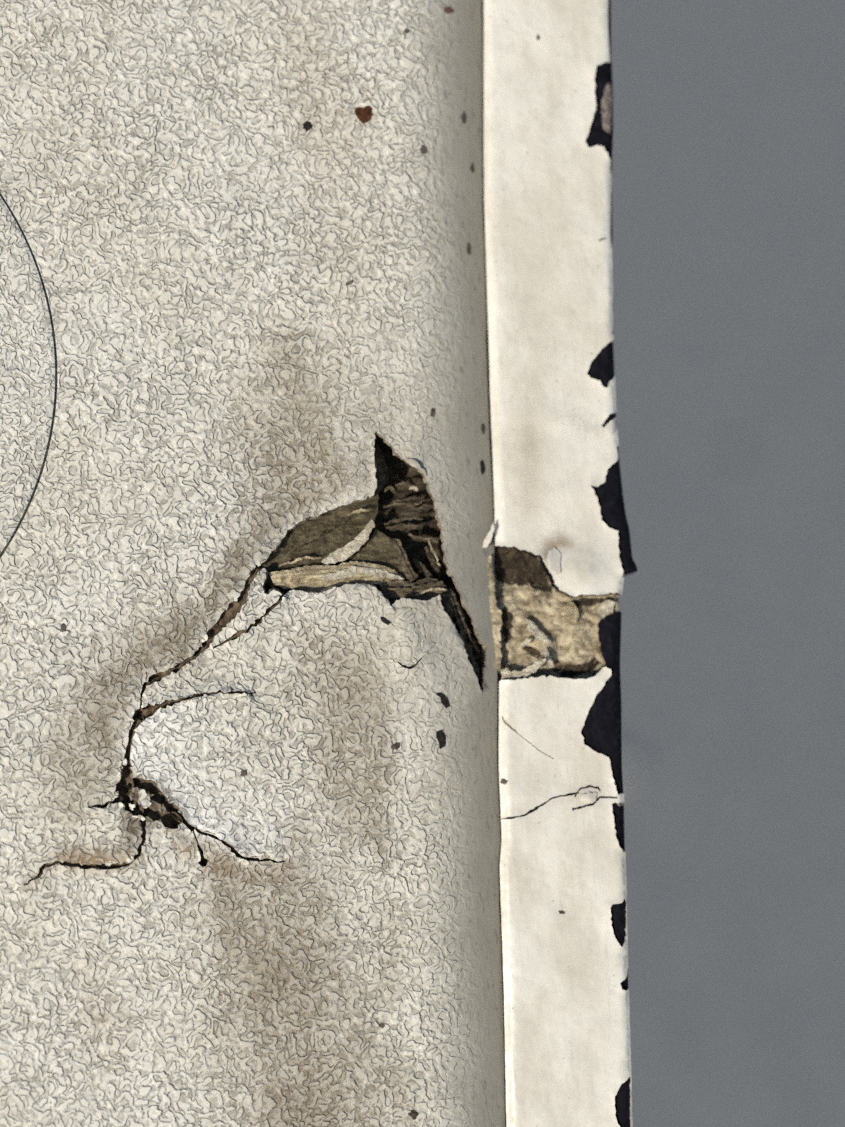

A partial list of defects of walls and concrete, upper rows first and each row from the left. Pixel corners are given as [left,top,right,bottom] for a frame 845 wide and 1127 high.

peeling [601,413,616,433]
peeling [591,446,637,578]
spalling [264,584,308,594]
spalling [331,435,625,852]
crack [24,565,289,885]